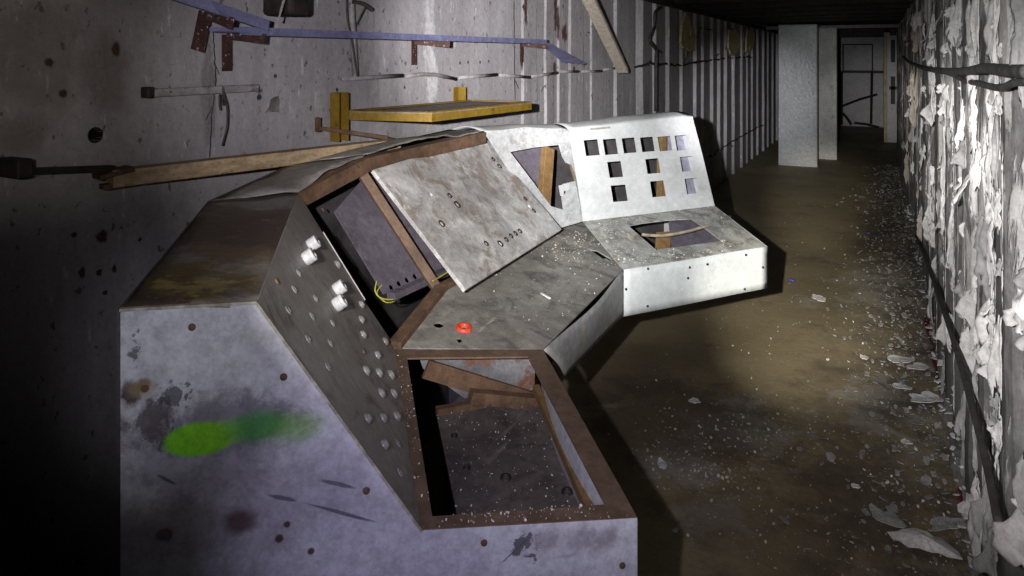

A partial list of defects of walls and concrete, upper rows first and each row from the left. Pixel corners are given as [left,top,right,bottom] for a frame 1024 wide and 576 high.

peeling [900,0,1024,576]